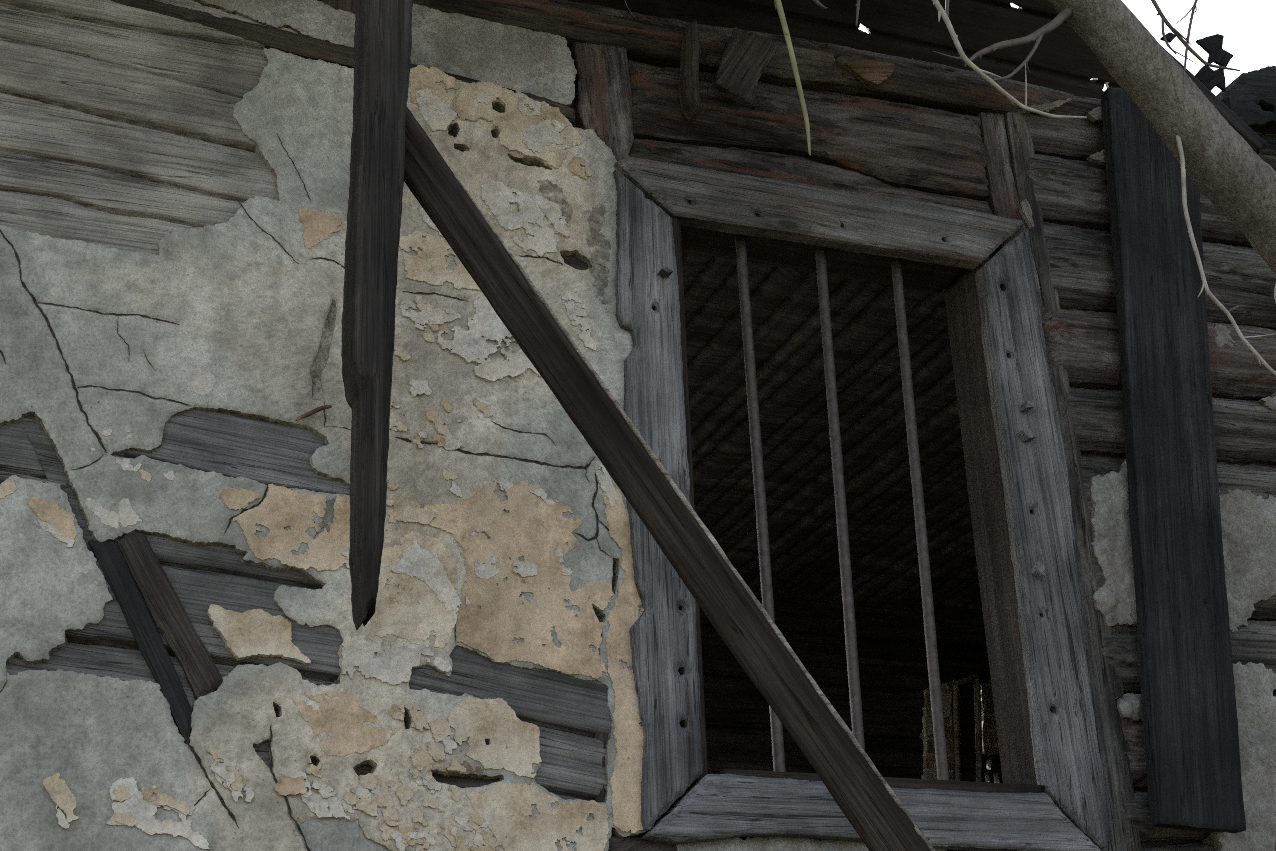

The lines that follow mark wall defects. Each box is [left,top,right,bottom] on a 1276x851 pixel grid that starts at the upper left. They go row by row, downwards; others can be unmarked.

spalling [0,0,298,256]
crack [276,133,311,200]
peeling [409,65,593,180]
crack [236,198,345,269]
peeling [297,207,345,249]
peeling [481,181,592,270]
crack [0,230,195,470]
peeling [393,208,541,382]
peeling [0,370,650,851]